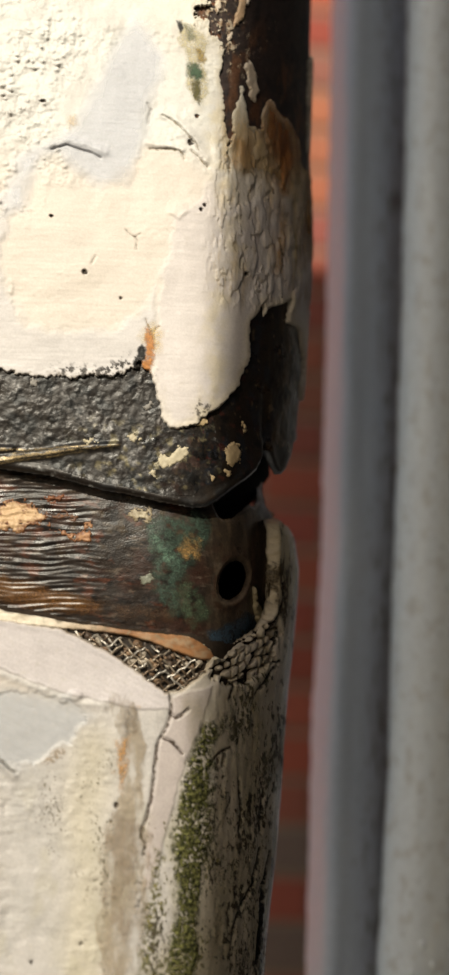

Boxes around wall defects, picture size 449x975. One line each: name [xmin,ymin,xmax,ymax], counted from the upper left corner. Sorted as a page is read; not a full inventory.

peeling [194,0,311,175]
peeling [0,302,302,496]
peeling [0,494,93,543]
peeling [126,506,153,524]
corrosion [0,574,99,612]
peeling [140,571,155,585]
peeling [252,586,262,623]
damp [264,545,297,649]
spalling [64,628,219,692]
damp [90,727,148,886]
crack [141,692,189,855]
damp [131,659,286,975]